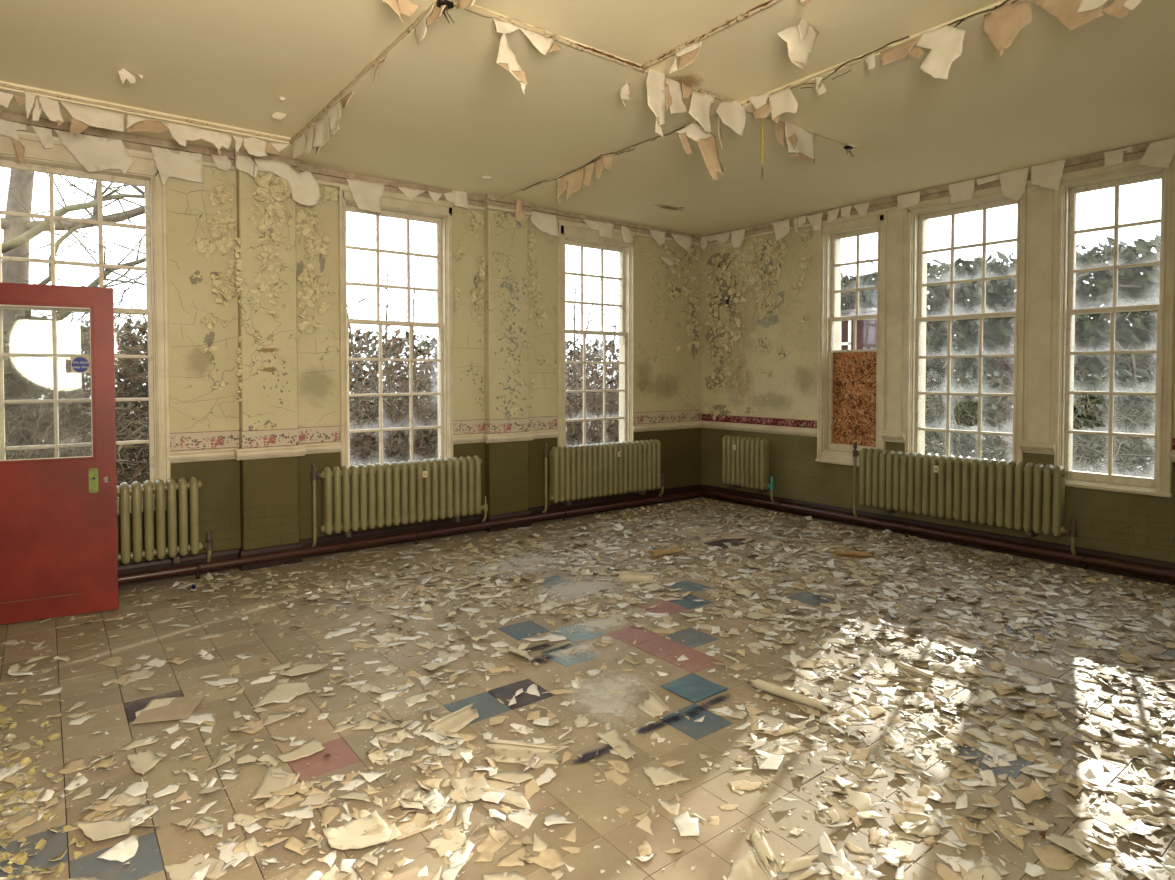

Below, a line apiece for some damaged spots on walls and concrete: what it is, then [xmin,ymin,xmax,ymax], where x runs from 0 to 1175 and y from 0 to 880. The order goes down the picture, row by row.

peeling [118,68,143,84]
peeling [383,0,475,44]
peeling [494,20,562,94]
peeling [646,41,815,180]
peeling [777,0,819,69]
peeling [864,26,966,79]
peeling [983,0,1143,56]
peeling [0,91,485,353]
peeling [502,153,615,237]
peeling [949,159,1066,204]
peeling [1104,136,1175,169]
peeling [583,202,870,420]